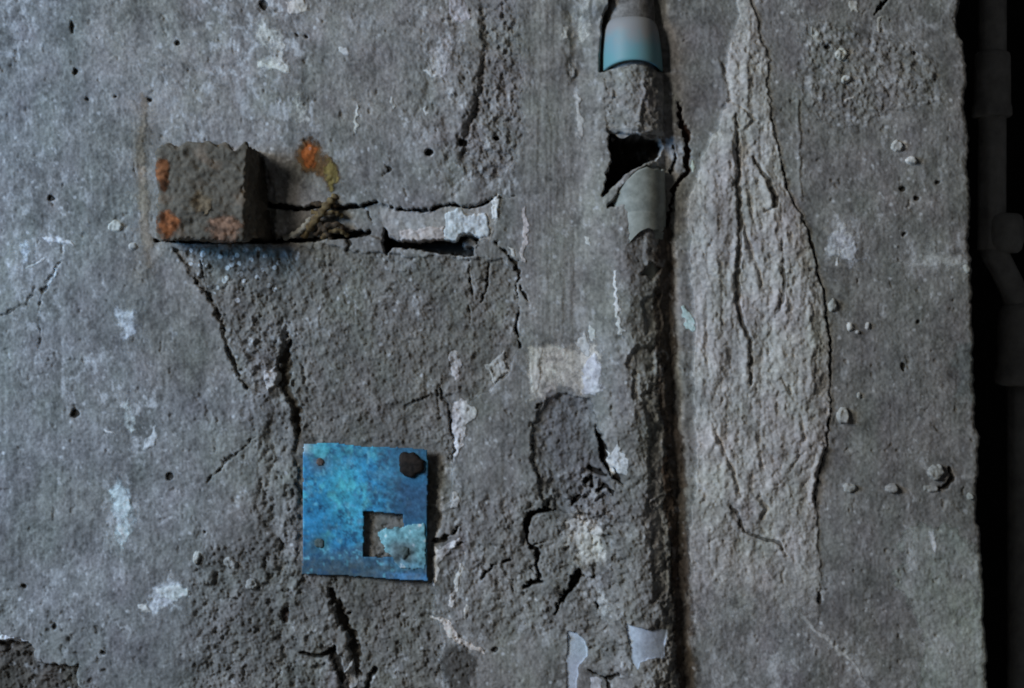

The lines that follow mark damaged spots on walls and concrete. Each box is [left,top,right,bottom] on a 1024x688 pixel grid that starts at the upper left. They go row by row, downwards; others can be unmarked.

rust [295,137,339,192]
spalling [602,134,660,197]
crack [155,196,514,390]
crack [468,242,527,348]
crack [771,118,832,507]
crack [404,388,456,454]
crack [481,506,599,615]